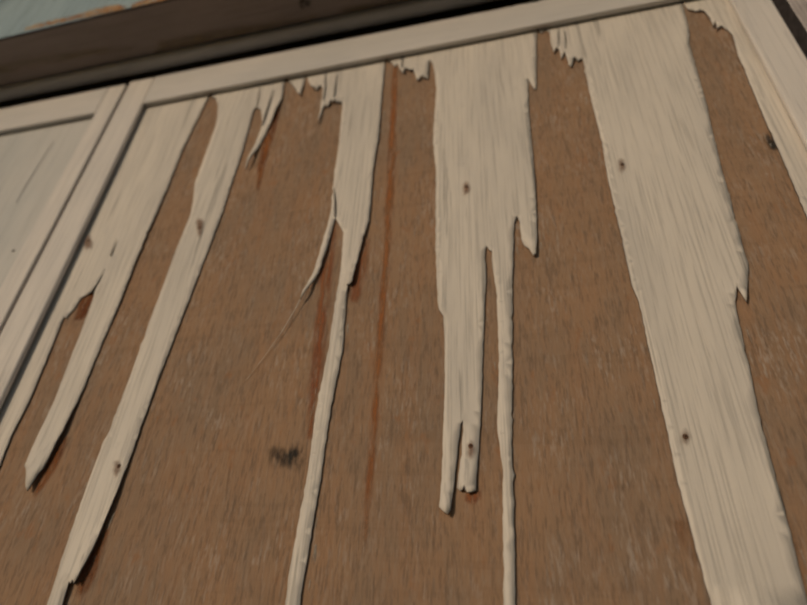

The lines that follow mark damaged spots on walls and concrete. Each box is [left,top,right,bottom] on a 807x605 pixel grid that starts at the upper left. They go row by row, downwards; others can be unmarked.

peeling [0,93,218,605]
corrosion [372,68,397,432]
peeling [65,29,711,605]
peeling [681,1,807,598]